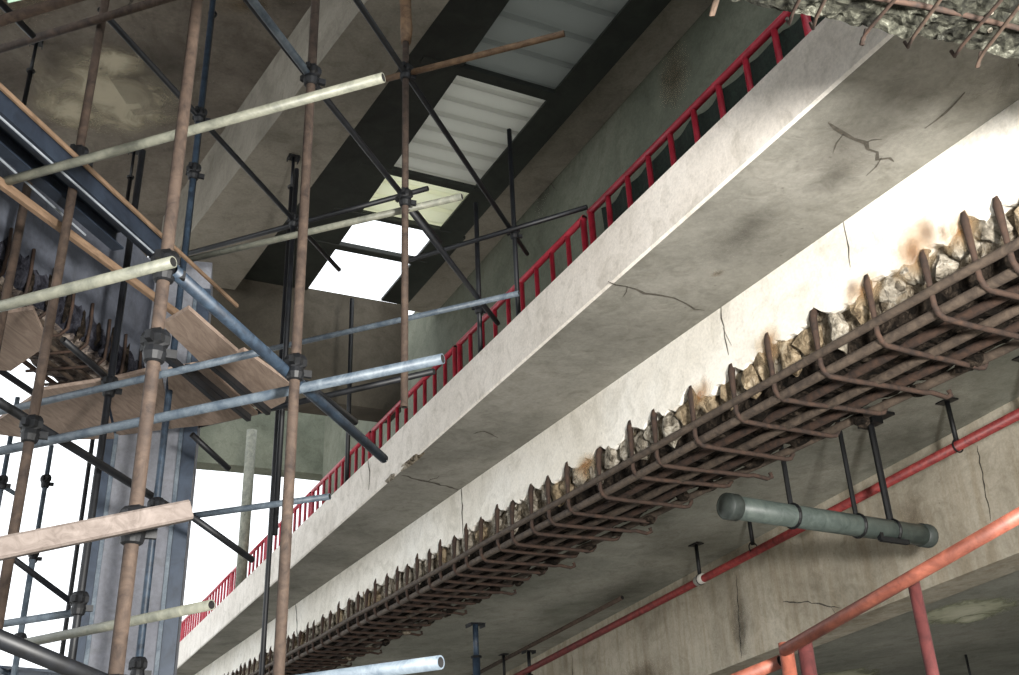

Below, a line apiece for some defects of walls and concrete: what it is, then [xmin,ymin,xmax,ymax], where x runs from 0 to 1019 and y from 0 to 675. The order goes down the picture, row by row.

spalling [730,0,1019,59]
crack [828,122,894,176]
corrosion [902,239,920,261]
crack [608,281,732,355]
spalling [285,206,1019,674]